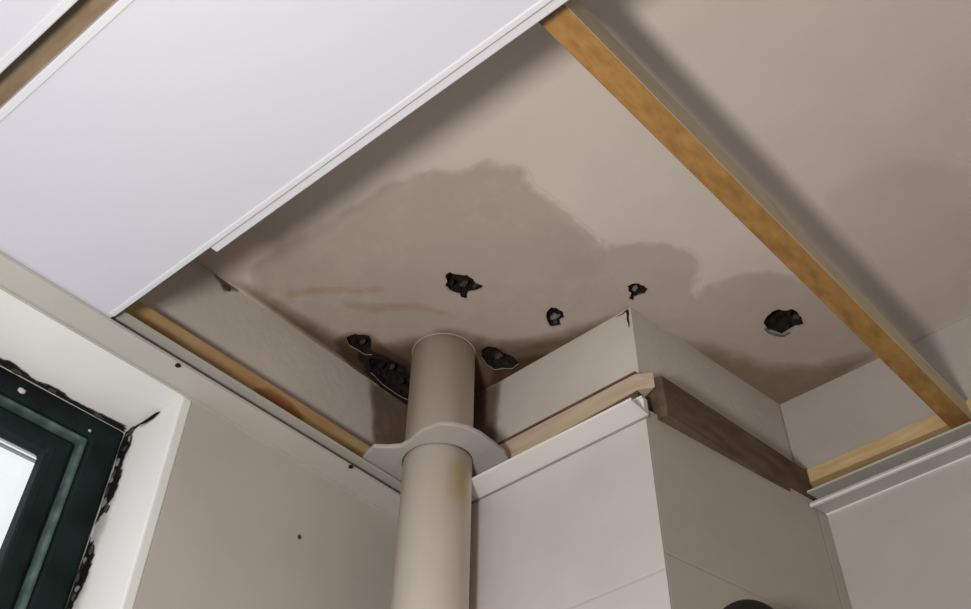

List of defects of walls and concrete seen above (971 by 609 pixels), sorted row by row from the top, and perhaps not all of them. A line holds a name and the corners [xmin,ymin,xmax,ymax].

water stain [245,156,879,444]